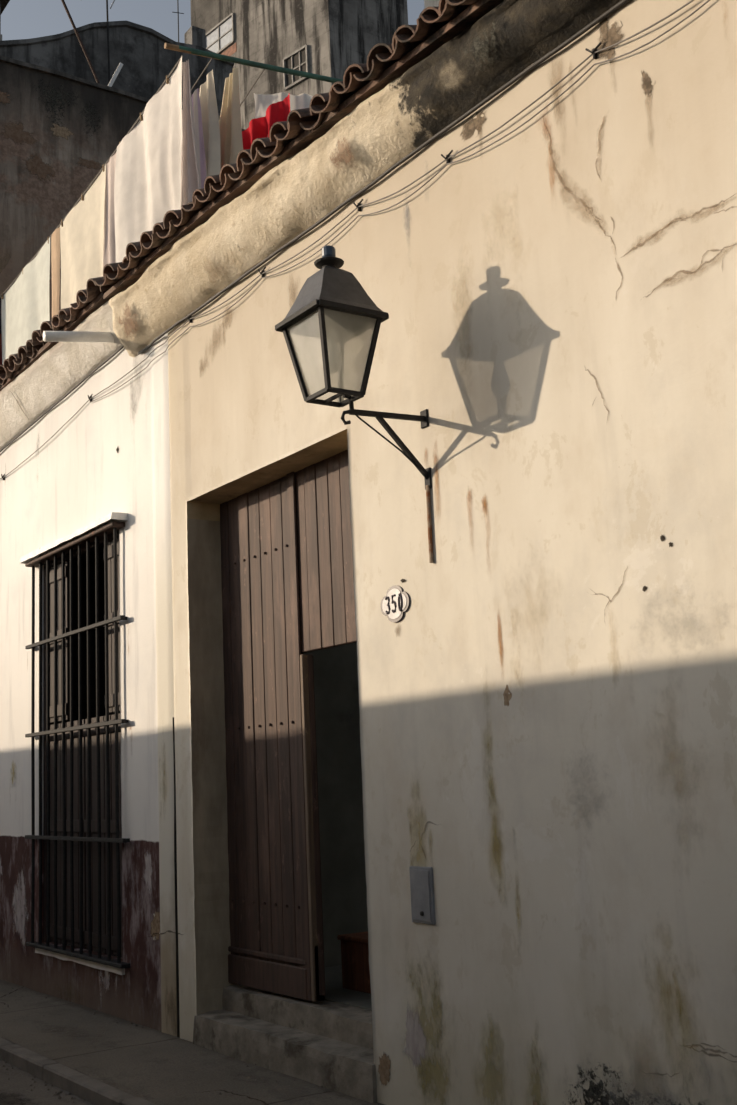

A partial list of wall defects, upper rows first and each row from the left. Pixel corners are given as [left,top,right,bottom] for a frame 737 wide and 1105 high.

crack [547,130,730,297]
leakage [570,1064,702,1105]